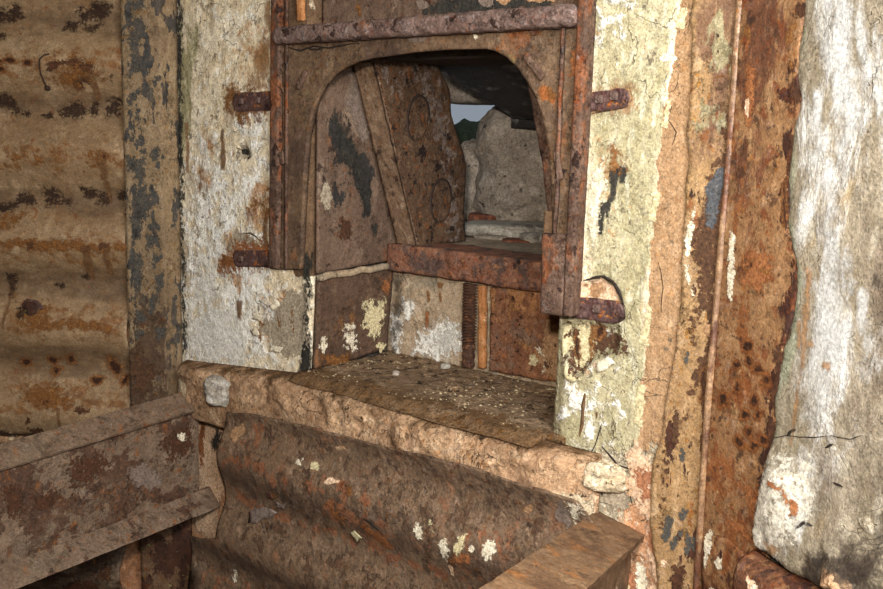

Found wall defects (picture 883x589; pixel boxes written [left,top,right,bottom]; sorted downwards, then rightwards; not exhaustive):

corrosion [0,52,123,120]
corrosion [222,1,271,128]
flaking render [661,97,671,129]
flaking render [676,7,688,29]
corrosion [744,61,756,131]
corrosion [786,1,806,103]
peeling [126,0,189,407]
corrosion [781,134,794,249]
corrosion [2,272,112,334]
peeling [604,113,728,589]
corrosion [717,231,813,453]
crack [773,429,862,440]